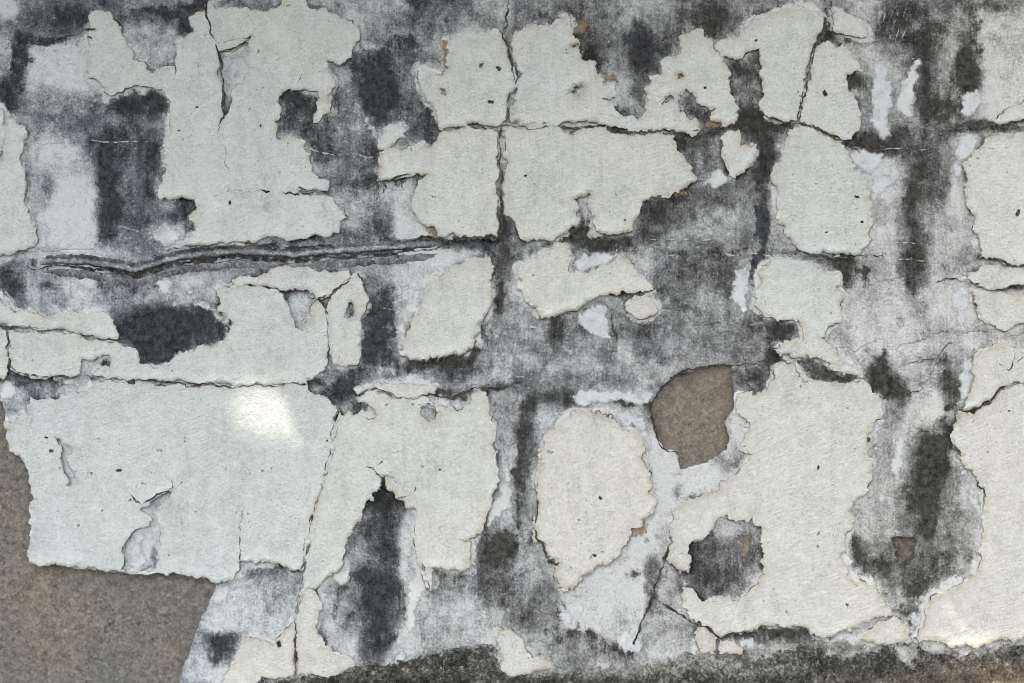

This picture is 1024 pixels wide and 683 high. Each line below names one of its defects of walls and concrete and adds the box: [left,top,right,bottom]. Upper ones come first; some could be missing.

damp [95,89,167,244]
damp [280,89,340,161]
crack [29,0,736,363]
damp [349,0,425,126]
damp [547,61,788,290]
crack [769,2,893,153]
damp [114,305,231,365]
peeling [208,0,1024,683]
spalling [0,323,307,683]
damp [330,489,407,651]
damp [477,386,574,607]
damp [849,350,961,626]